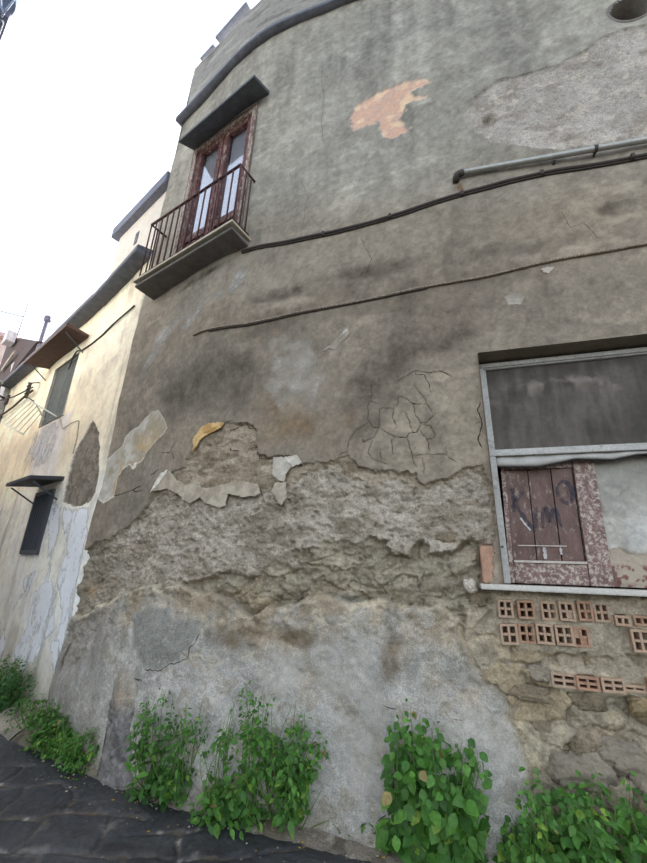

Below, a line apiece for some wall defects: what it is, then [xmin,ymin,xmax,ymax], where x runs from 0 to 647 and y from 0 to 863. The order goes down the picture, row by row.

flaking render [466,23,647,150]
crack [338,363,483,470]
crack [134,633,200,681]
flaking render [0,409,647,863]